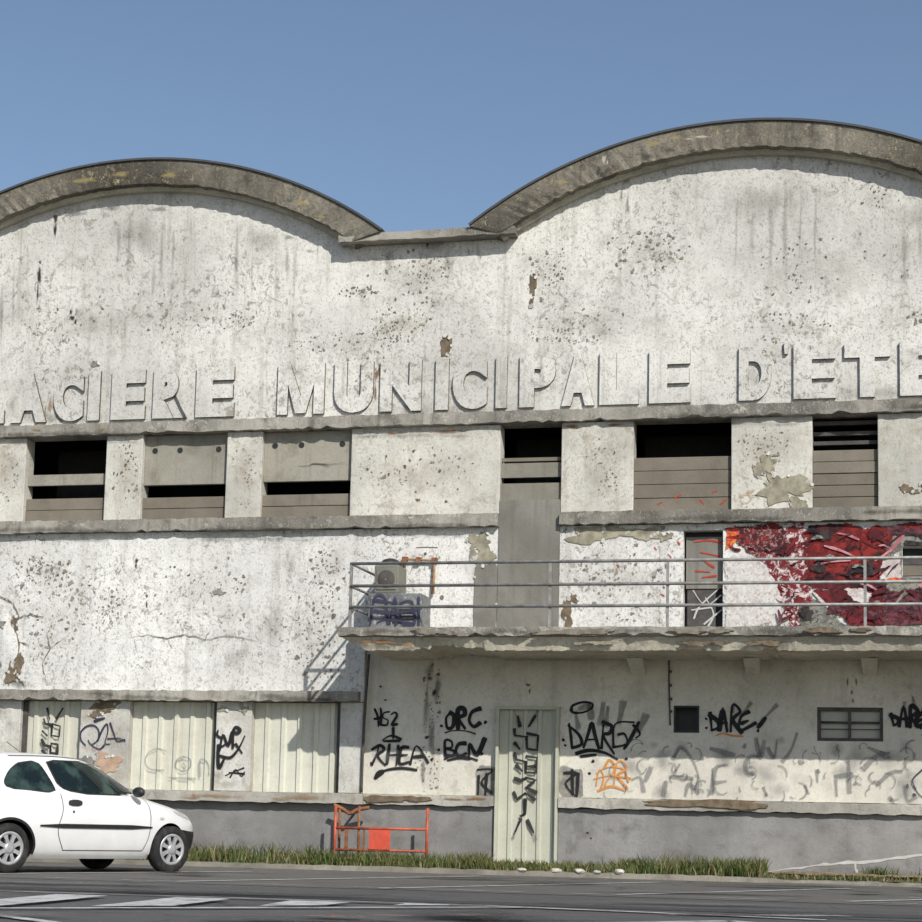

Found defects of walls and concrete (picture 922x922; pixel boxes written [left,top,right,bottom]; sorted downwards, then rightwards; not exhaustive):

peeling [289,249,453,361]
spalling [528,248,566,308]
peeling [738,431,814,508]
peeling [900,482,922,494]
crack [0,596,60,687]
peeling [0,556,95,684]
crack [131,634,255,649]
peeling [465,530,498,627]
peeling [530,525,674,646]